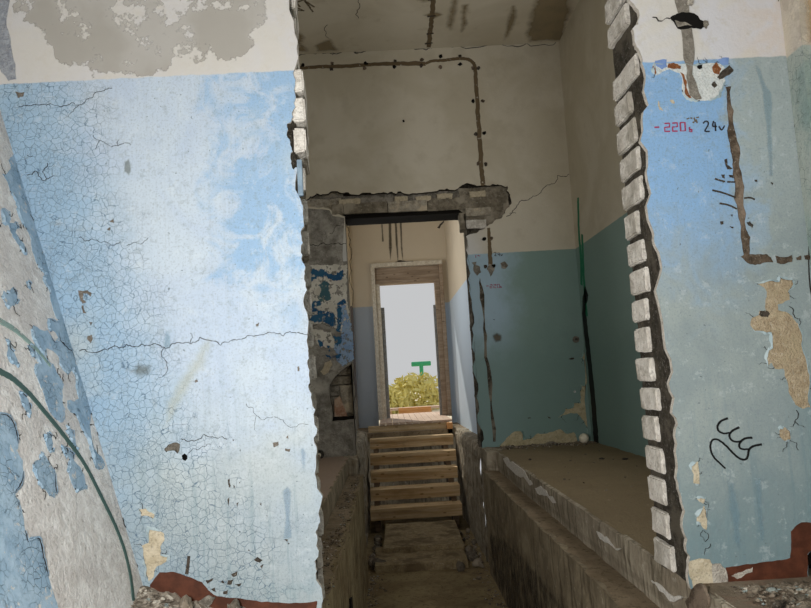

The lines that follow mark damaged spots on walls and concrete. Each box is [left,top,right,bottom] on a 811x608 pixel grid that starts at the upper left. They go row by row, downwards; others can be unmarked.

peeling [0,0,267,81]
damp [528,0,569,41]
crack [19,88,111,112]
crack [506,174,569,217]
peeling [0,154,105,608]
crack [80,323,343,378]
flaking render [287,0,355,490]
spalling [472,261,508,276]
peeling [497,351,589,447]
spalling [605,0,753,608]
peeling [746,276,811,450]
spalling [315,472,621,608]